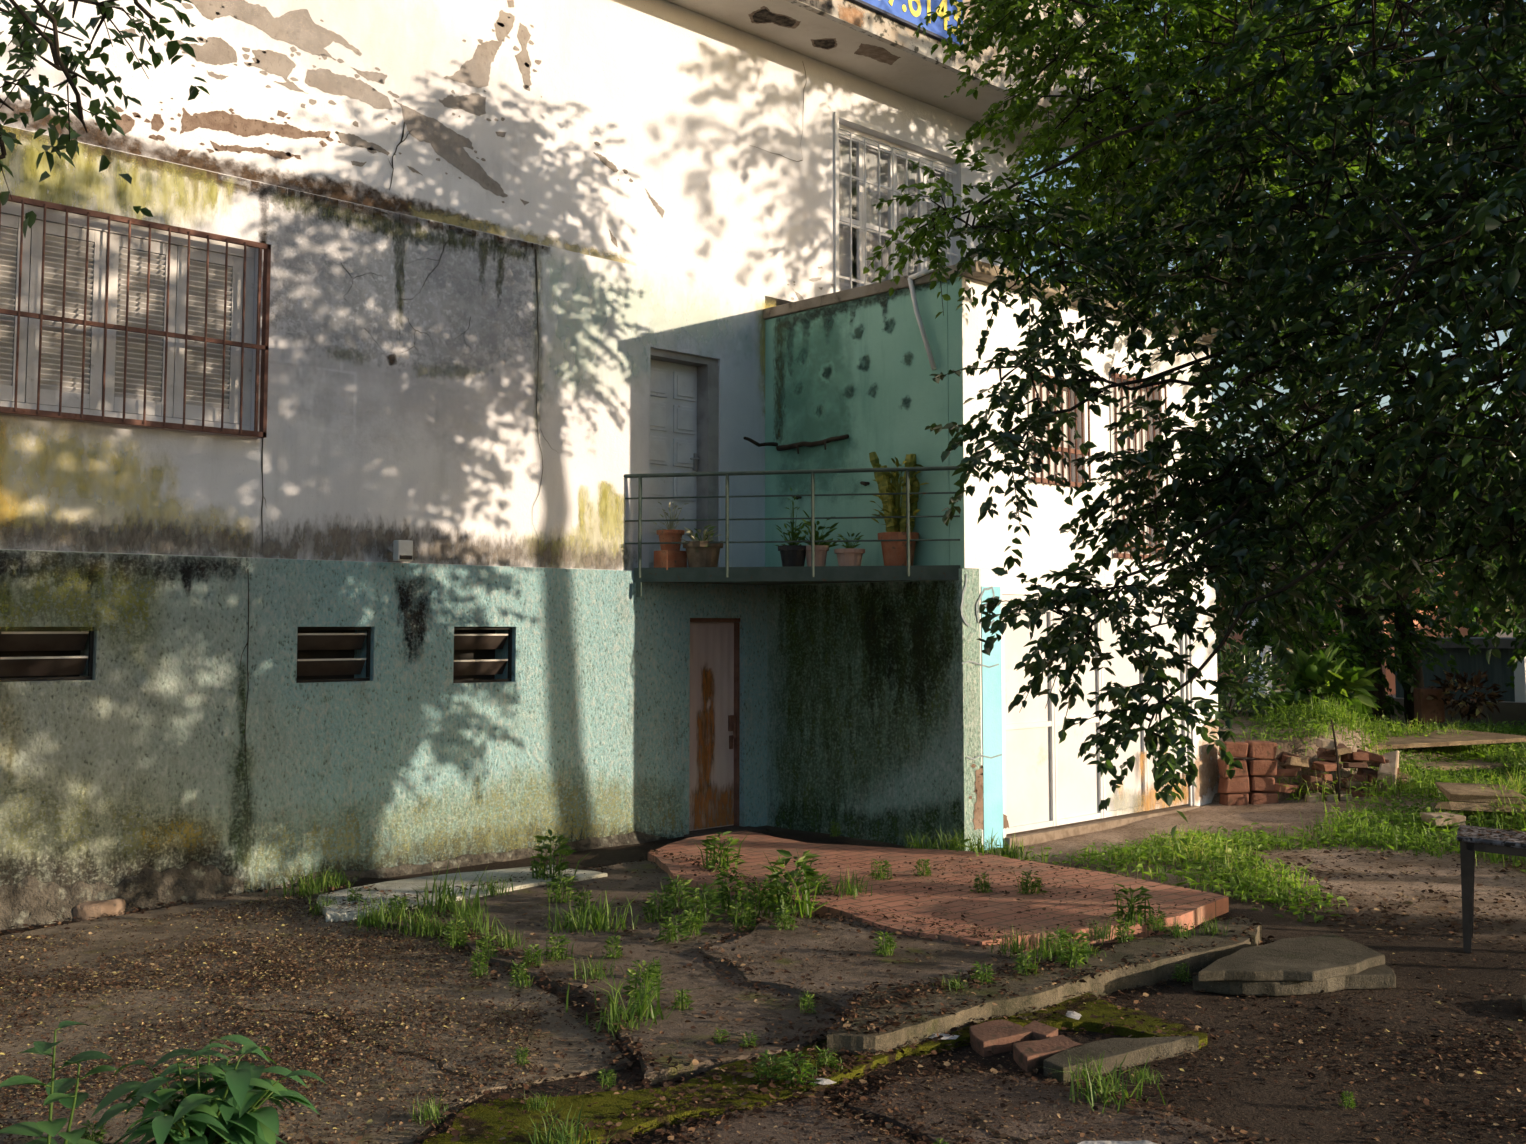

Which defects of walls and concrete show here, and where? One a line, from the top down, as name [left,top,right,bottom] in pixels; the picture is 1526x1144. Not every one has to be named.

peeling [115,0,542,206]
spalling [748,6,801,29]
spalling [811,38,837,50]
spalling [854,43,901,65]
damp [0,98,550,318]
peeling [593,142,665,218]
crack [341,237,473,358]
damp [0,434,628,659]
damp [787,587,954,723]
corrosion [691,668,734,829]
damp [0,821,652,893]